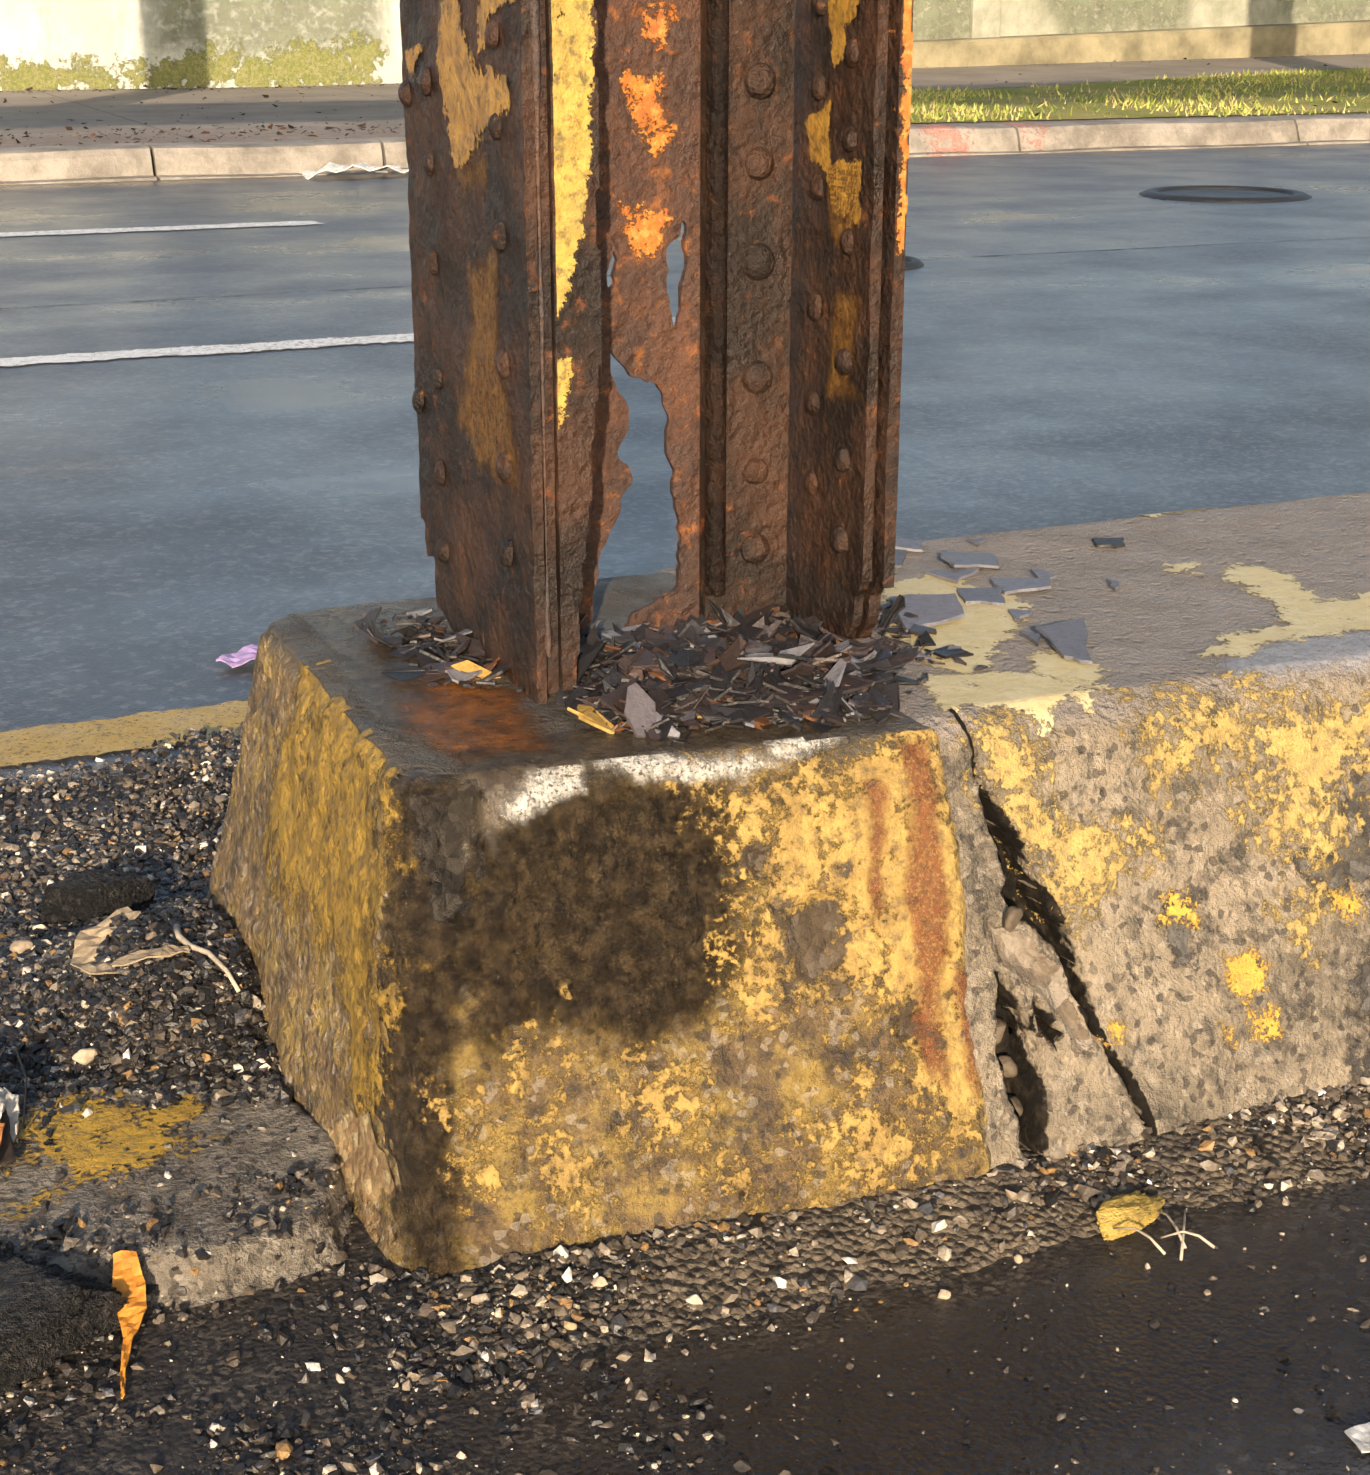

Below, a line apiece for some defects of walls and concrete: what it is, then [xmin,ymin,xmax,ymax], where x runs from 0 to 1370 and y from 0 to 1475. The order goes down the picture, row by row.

peeling [551,0,597,317]
rust [613,200,674,264]
rust [619,68,679,159]
rust [640,1,680,51]
rust [889,0,913,255]
rust [458,250,517,484]
peeling [557,356,575,430]
peeling [263,659,486,1207]
peeling [415,560,1370,1246]
rust [902,743,948,1084]
rust [956,972,978,1088]
crack [948,707,1157,1154]